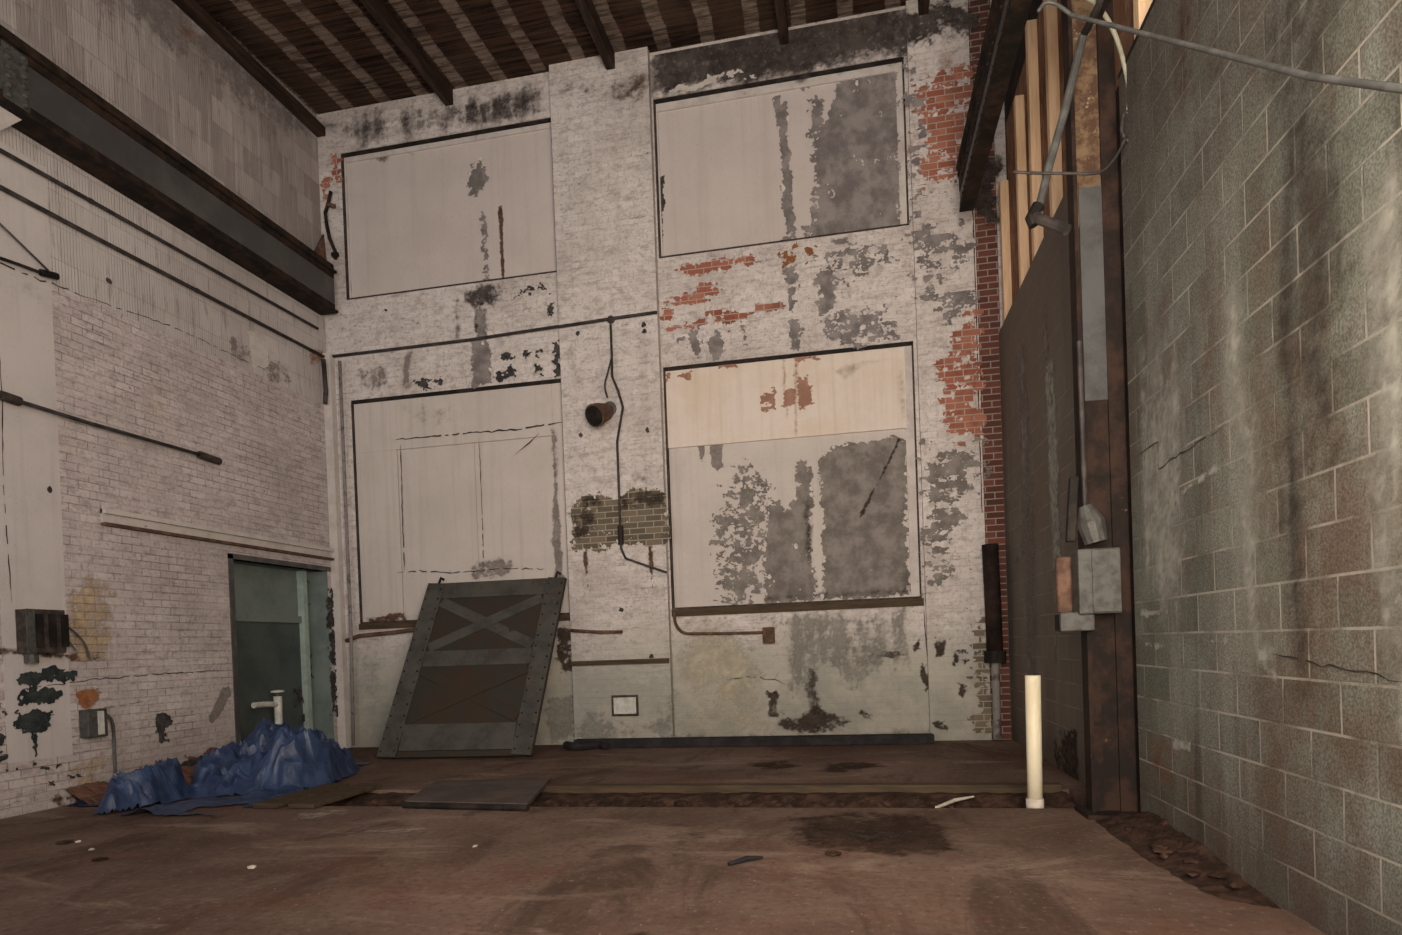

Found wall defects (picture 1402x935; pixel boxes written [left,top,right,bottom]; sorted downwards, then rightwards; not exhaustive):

spalling [569,487,671,553]
damp [698,445,723,471]
peeling [641,46,993,605]
damp [1140,353,1220,619]
damp [1226,288,1277,679]
damp [1291,113,1330,423]
damp [1369,175,1402,476]
peeling [0,703,19,772]
damp [683,620,760,726]
damp [778,608,908,733]